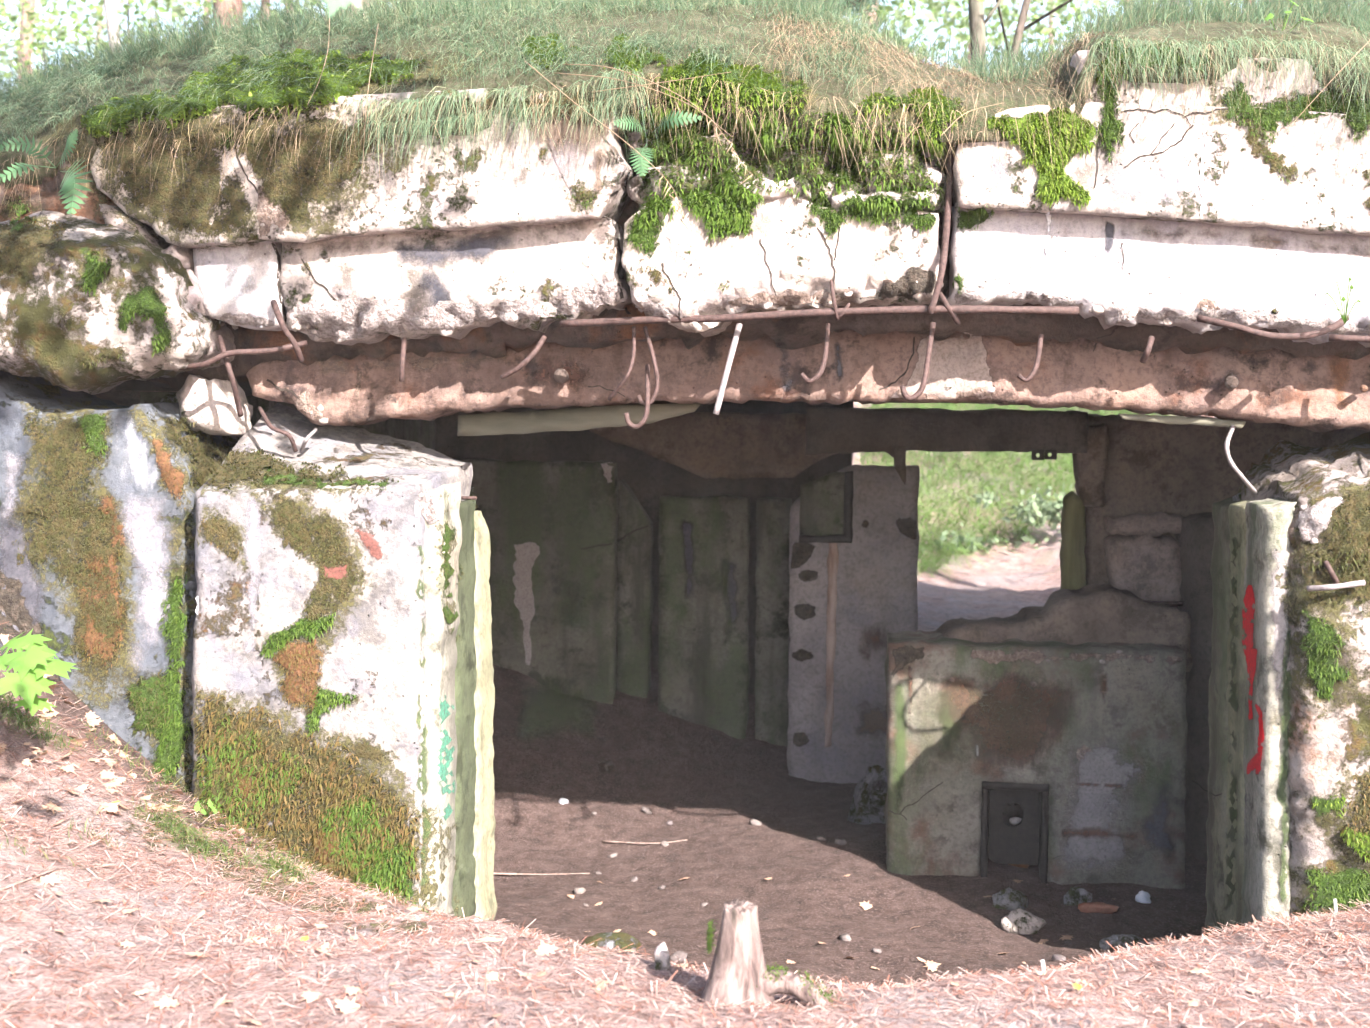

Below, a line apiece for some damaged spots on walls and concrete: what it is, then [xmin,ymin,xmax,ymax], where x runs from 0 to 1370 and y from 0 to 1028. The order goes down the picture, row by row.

crack [1094,108,1229,216]
crack [235,148,337,333]
crack [599,170,631,317]
crack [661,263,681,321]
spalling [179,154,1370,453]
rust [536,360,586,389]
leakage [940,694,961,752]